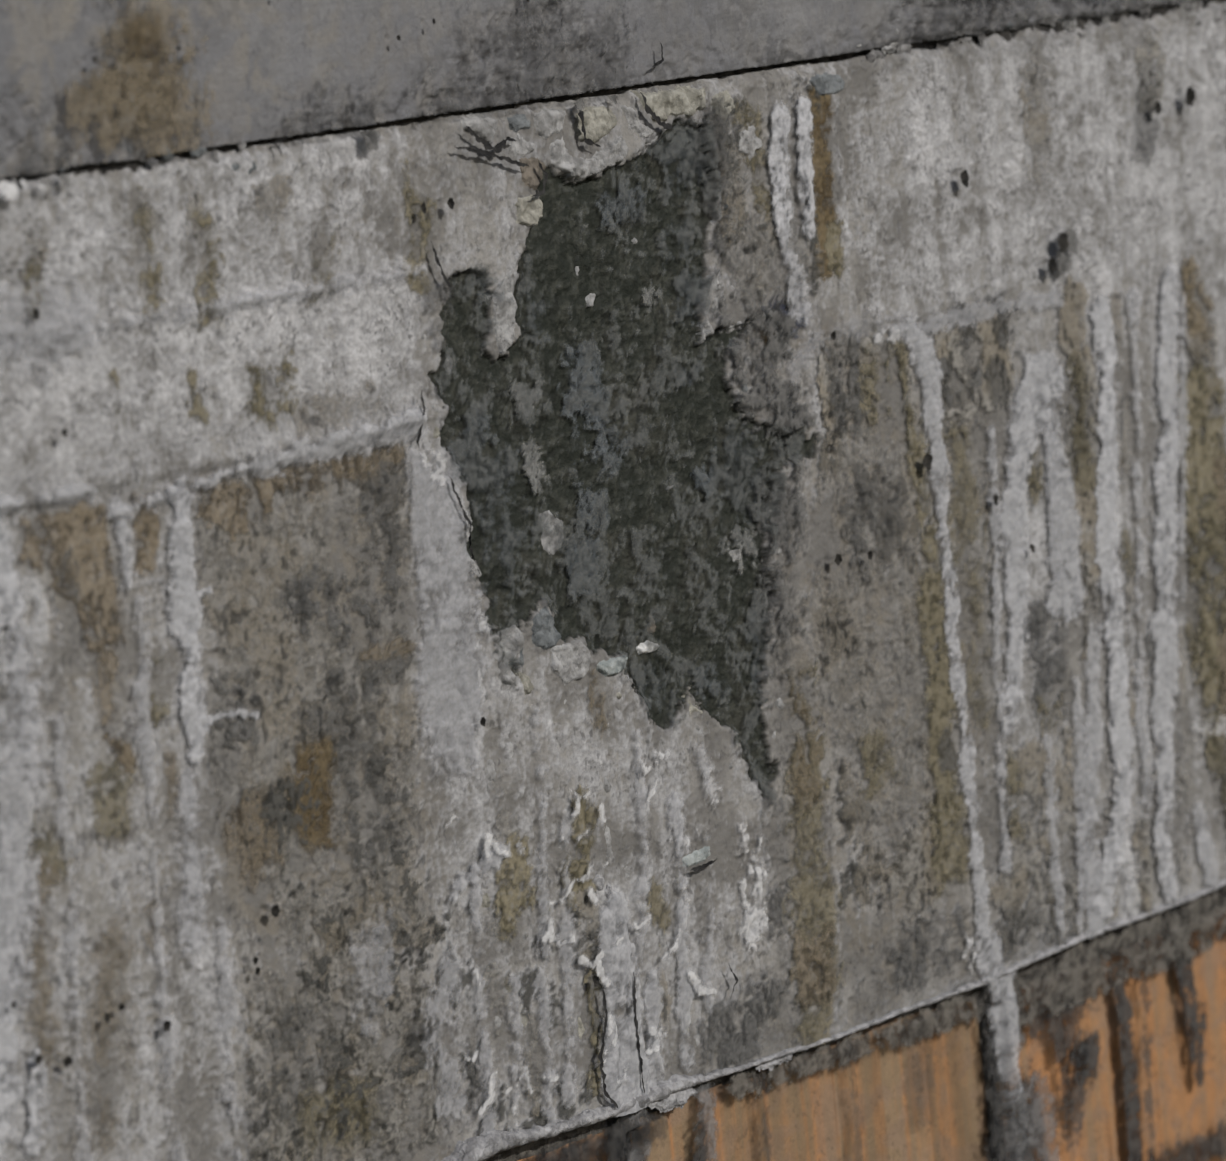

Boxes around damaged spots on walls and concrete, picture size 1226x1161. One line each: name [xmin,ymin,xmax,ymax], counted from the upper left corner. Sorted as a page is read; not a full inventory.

spalling [286,72,386,136]
leakage [1018,47,1053,190]
leakage [1134,30,1166,119]
spalling [427,85,826,801]
leakage [0,256,1226,1161]
flaking render [485,833,508,858]
flaking render [529,777,613,987]
flaking render [688,971,717,996]
flaking render [577,1012,617,1063]
crack [598,973,645,1108]
flaking render [642,1018,667,1054]
flaking render [479,1052,543,1125]